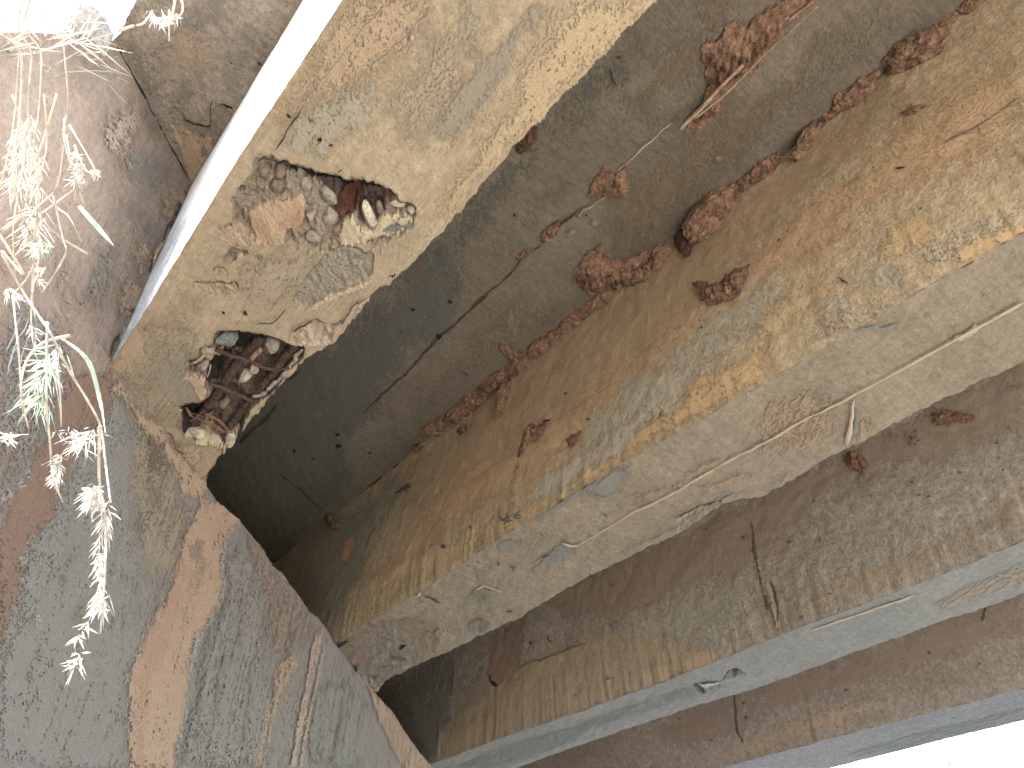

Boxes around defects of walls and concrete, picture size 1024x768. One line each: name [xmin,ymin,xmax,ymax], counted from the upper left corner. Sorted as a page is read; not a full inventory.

spalling [180,155,416,454]
crack [362,212,576,415]
crack [750,522,779,631]